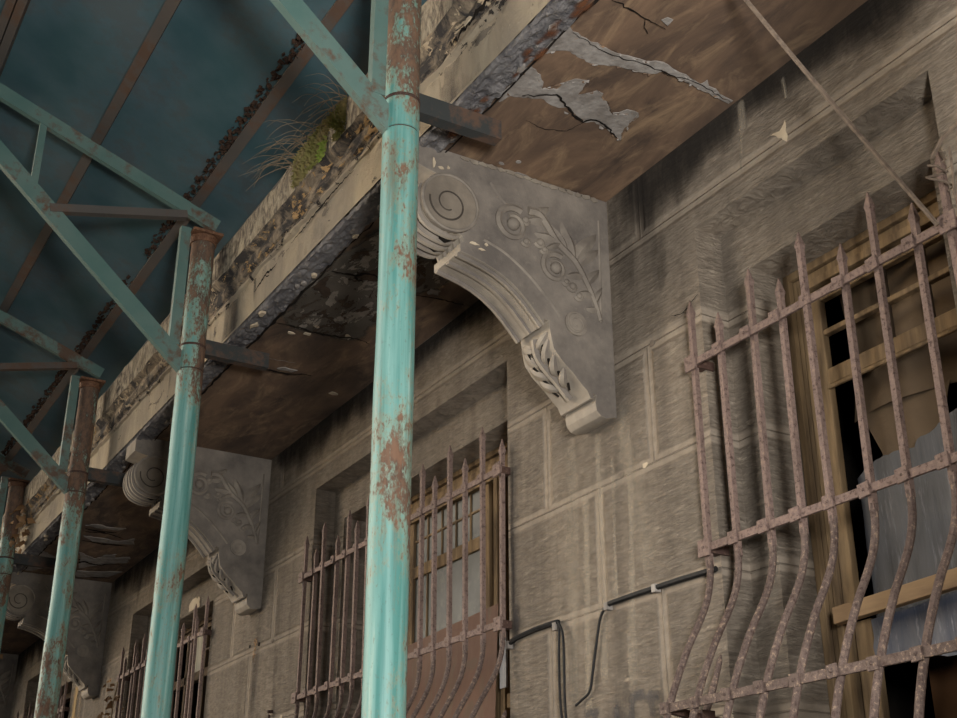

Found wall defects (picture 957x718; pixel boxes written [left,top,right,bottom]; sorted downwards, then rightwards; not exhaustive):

peeling [420,0,507,61]
spalling [452,0,733,141]
spalling [419,125,463,170]
spalling [93,353,175,473]
spalling [12,512,62,575]
flaking render [76,524,135,578]